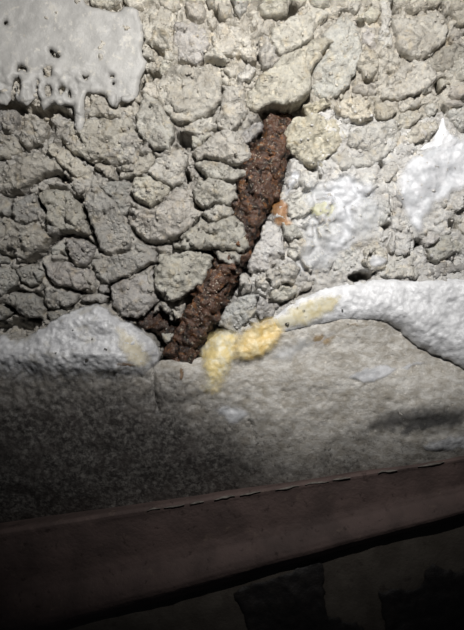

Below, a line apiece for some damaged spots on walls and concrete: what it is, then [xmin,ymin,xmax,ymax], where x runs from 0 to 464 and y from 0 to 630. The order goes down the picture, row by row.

crack [20,210,99,264]
crack [137,230,188,246]
spalling [0,0,464,361]
rust [272,199,290,225]
efflorescence [285,171,299,194]
efflorescence [299,176,380,269]
efflorescence [399,118,464,229]
rust [202,319,282,390]